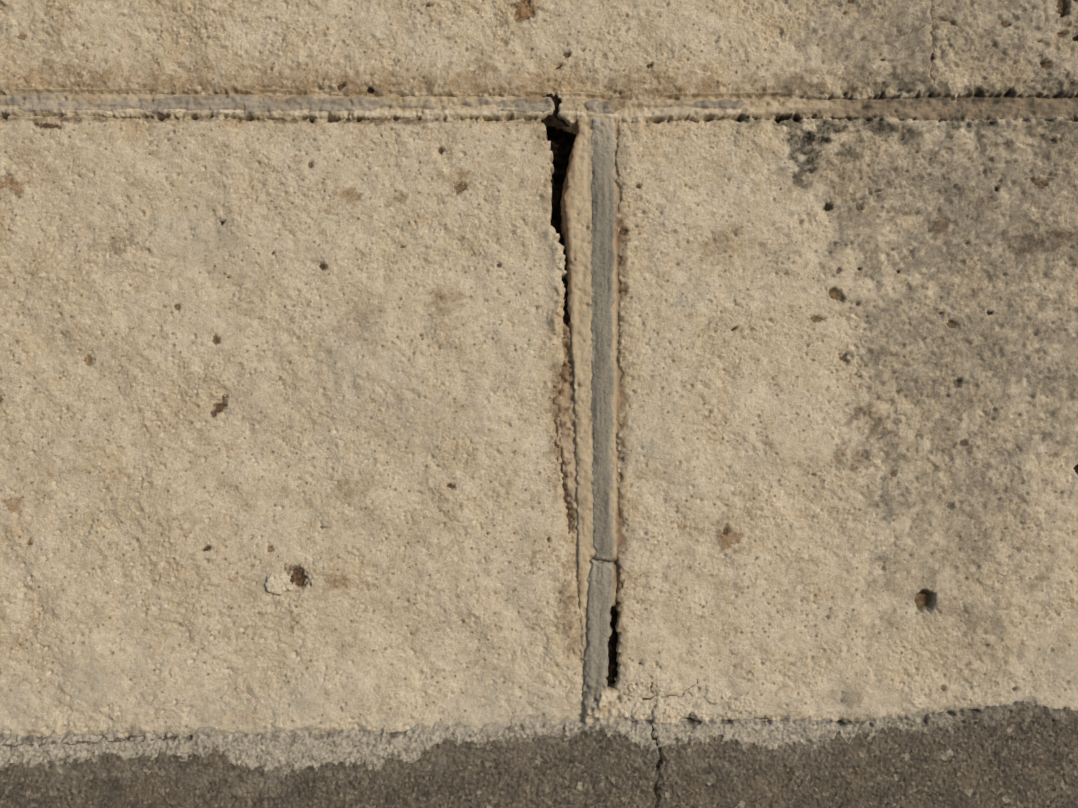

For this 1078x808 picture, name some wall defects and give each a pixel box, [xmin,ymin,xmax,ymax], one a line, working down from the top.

crack [541,94,576,345]
crack [554,416,573,534]